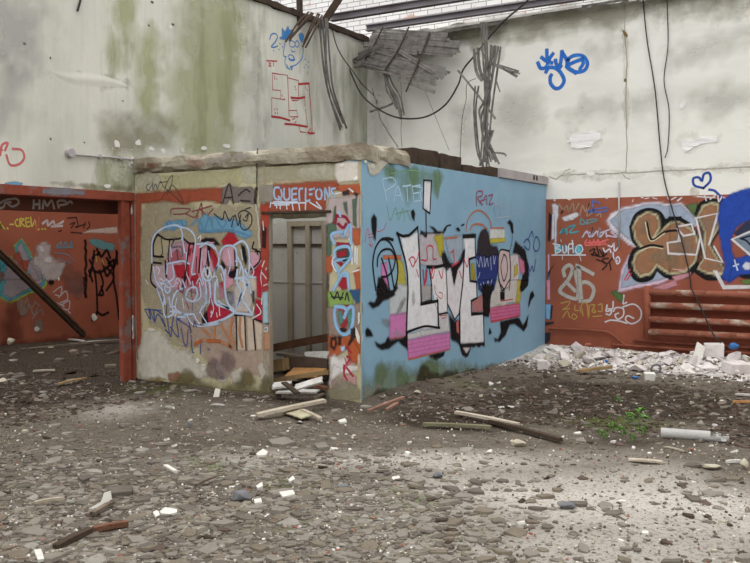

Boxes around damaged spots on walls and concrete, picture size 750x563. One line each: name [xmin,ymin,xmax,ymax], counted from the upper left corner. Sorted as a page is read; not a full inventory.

leakage [180,0,240,152]
leakage [108,128,166,151]
leakage [126,163,335,191]
leakage [140,201,278,395]
peeling [132,315,209,381]
peeling [217,362,244,383]
leakage [416,366,474,381]